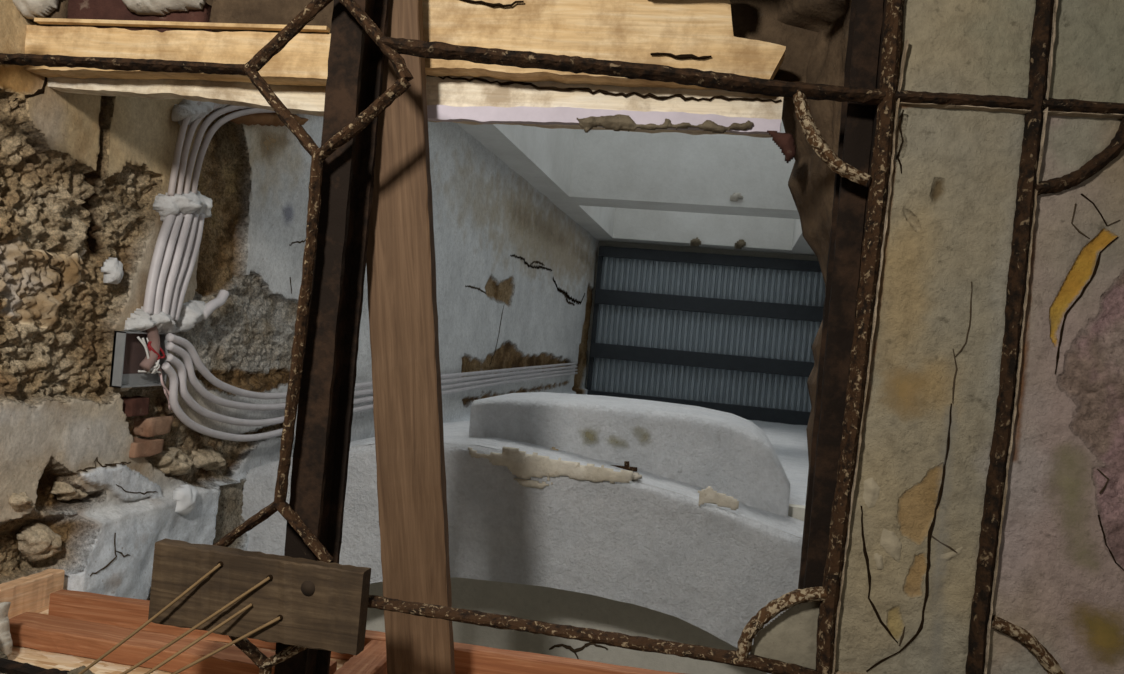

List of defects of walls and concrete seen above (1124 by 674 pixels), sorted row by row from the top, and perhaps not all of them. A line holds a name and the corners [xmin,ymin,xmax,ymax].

crack [427,75,781,102]
spalling [577,114,753,133]
spalling [767,130,796,163]
spalling [0,65,298,551]
spalling [461,283,594,408]
crack [510,254,585,306]
peeling [1049,229,1124,572]
spalling [0,456,107,584]
crack [860,282,972,672]
peeling [886,462,946,641]
crack [1097,469,1124,571]